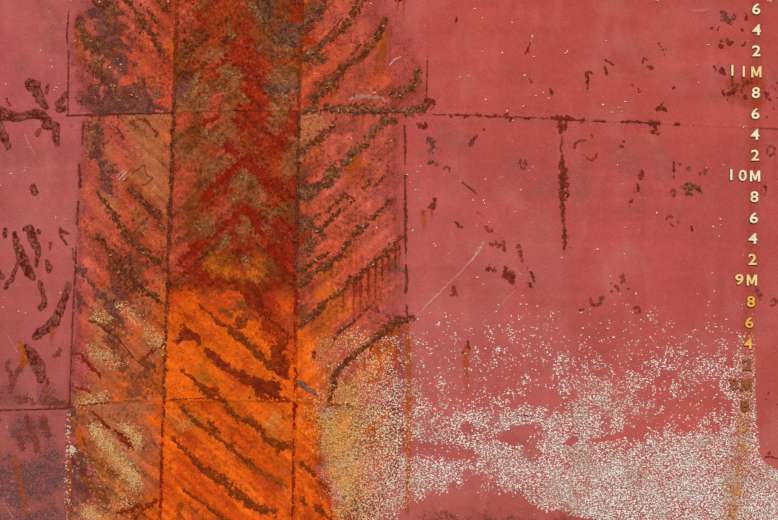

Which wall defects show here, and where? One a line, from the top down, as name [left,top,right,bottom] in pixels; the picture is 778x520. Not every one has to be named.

corrosion [710,10,748,49]
corrosion [713,65,778,118]
corrosion [621,102,667,135]
corrosion [0,0,606,520]